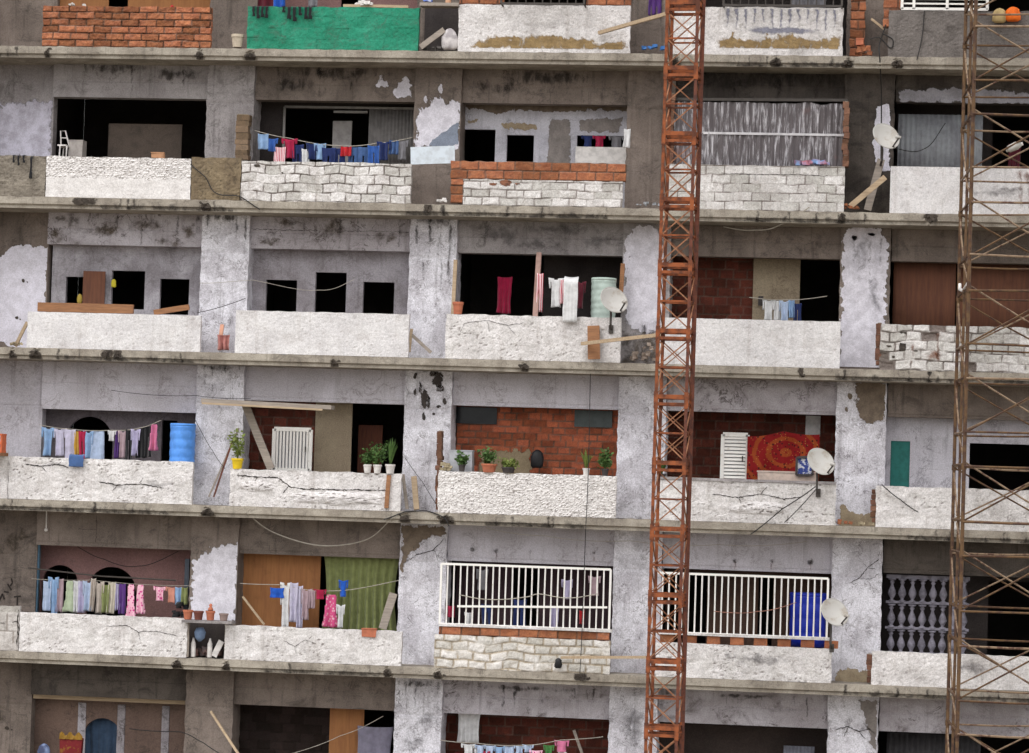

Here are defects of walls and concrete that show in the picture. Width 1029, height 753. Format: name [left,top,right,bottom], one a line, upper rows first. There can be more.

peeling [376,75,627,163]
peeling [874,87,1029,125]
peeling [872,139,891,171]
peeling [0,244,48,359]
peeling [623,225,664,334]
peeling [839,213,918,368]
peeling [845,382,886,424]
crack [100,478,162,490]
crack [713,487,801,500]
peeling [839,504,875,526]
peeling [190,542,238,621]
peeling [858,699,877,750]